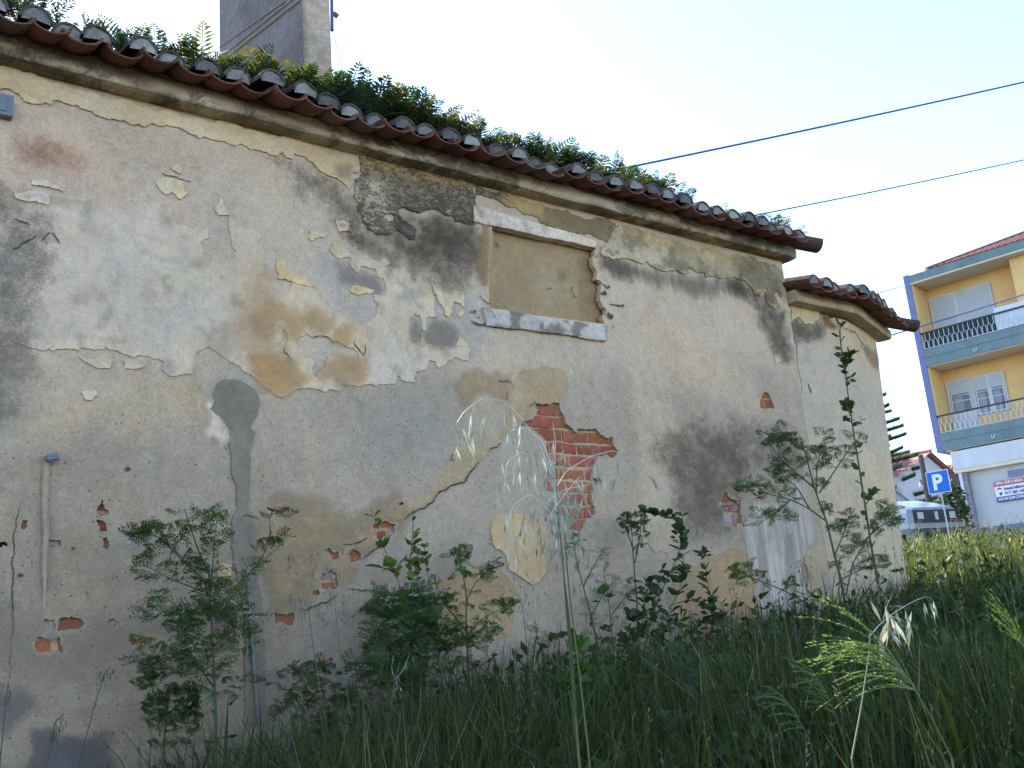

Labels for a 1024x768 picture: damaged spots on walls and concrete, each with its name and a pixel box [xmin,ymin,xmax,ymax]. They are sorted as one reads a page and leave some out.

peeling [0,66,820,397]
flaking render [760,392,772,410]
flaking render [96,501,108,549]
crack [405,443,501,519]
flaking render [521,403,616,531]
water stain [655,422,798,532]
flaking render [721,493,740,526]
crack [9,504,21,678]
flaking render [313,549,360,595]
flaking render [35,617,83,652]